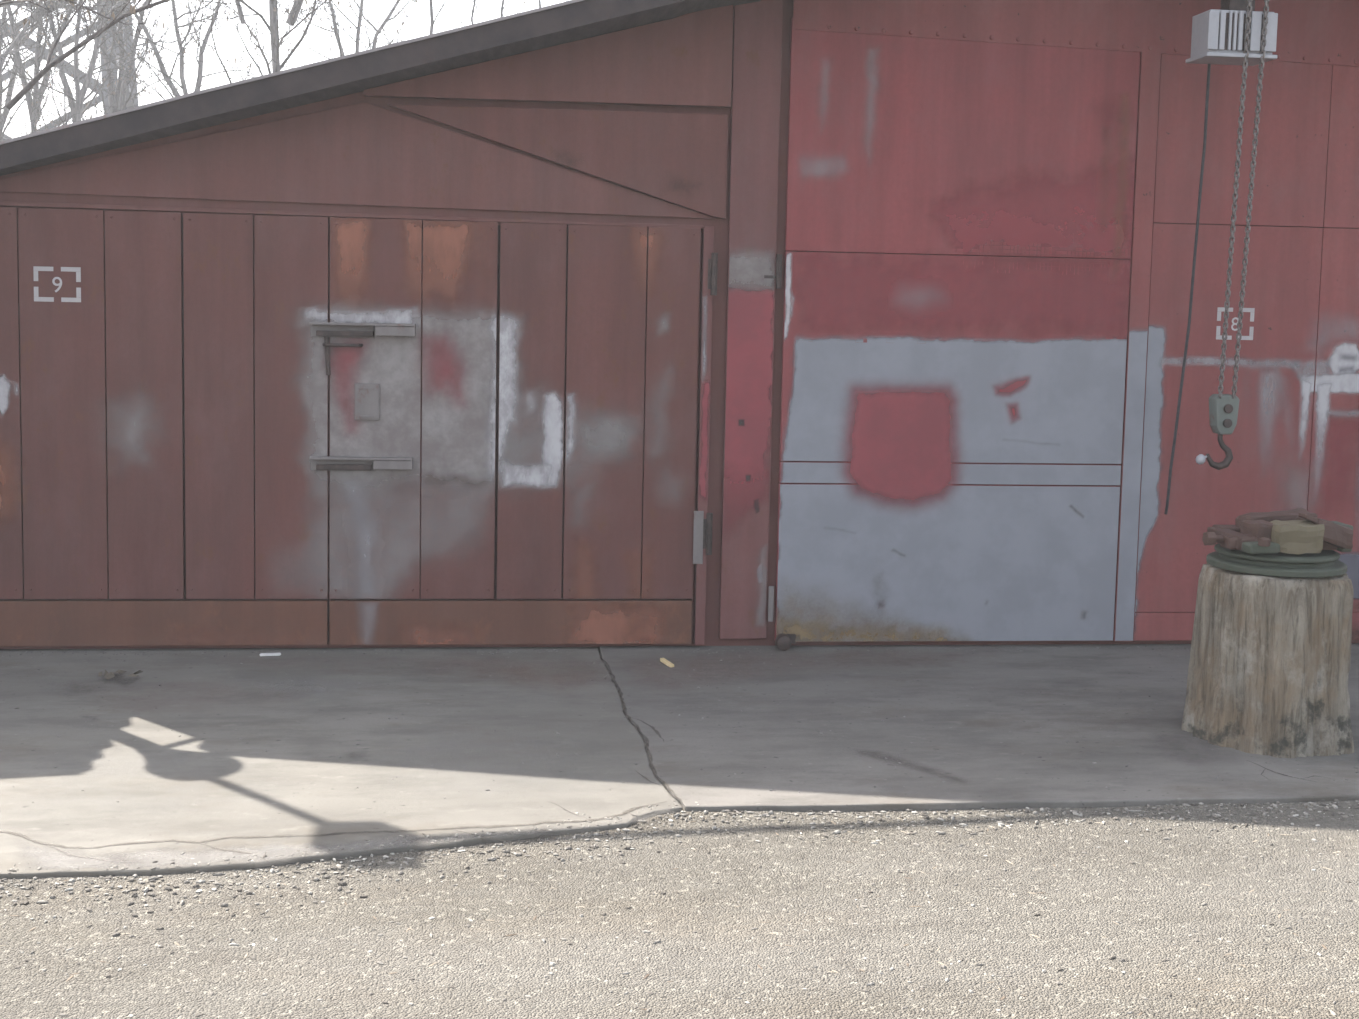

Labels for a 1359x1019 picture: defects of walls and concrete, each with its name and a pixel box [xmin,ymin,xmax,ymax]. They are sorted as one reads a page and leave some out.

rust [335,219,369,297]
rust [404,220,470,295]
rust [635,231,659,276]
rust [410,627,470,645]
rust [571,607,661,644]
crack [0,658,685,863]